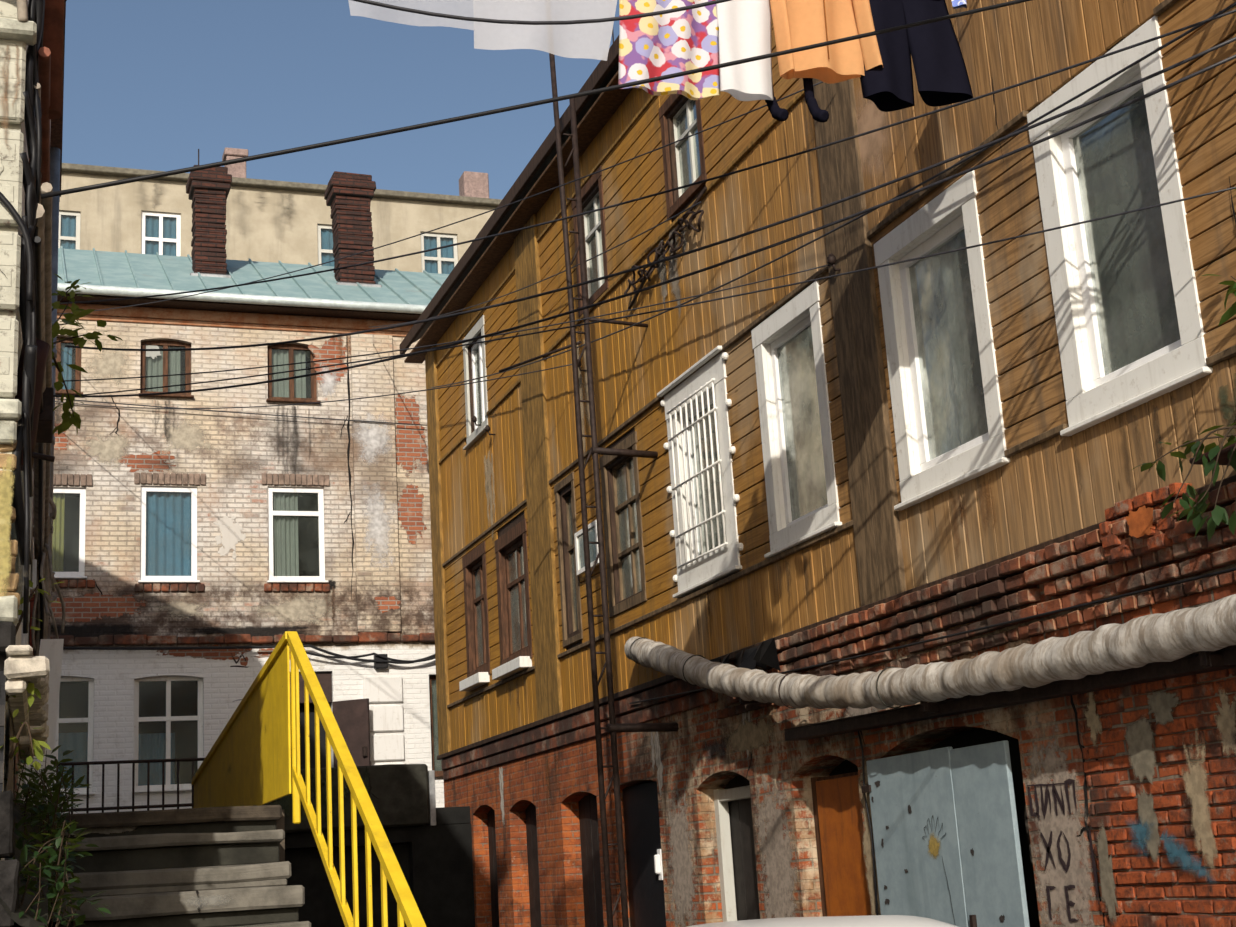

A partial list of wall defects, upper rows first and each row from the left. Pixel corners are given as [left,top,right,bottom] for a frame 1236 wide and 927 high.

spalling [0,442,20,609]
water stain [359,414,389,459]
flaking render [395,394,428,545]
flaking render [157,644,274,666]
peeling [304,648,334,670]
flaking render [1027,668,1236,927]